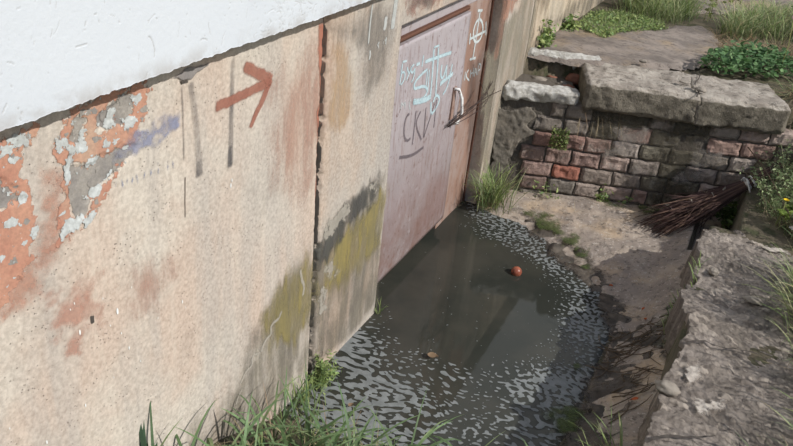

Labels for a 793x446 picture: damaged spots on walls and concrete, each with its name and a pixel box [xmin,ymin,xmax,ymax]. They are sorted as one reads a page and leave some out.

peeling [0,121,40,309]
peeling [52,79,153,248]
water stain [226,180,385,437]